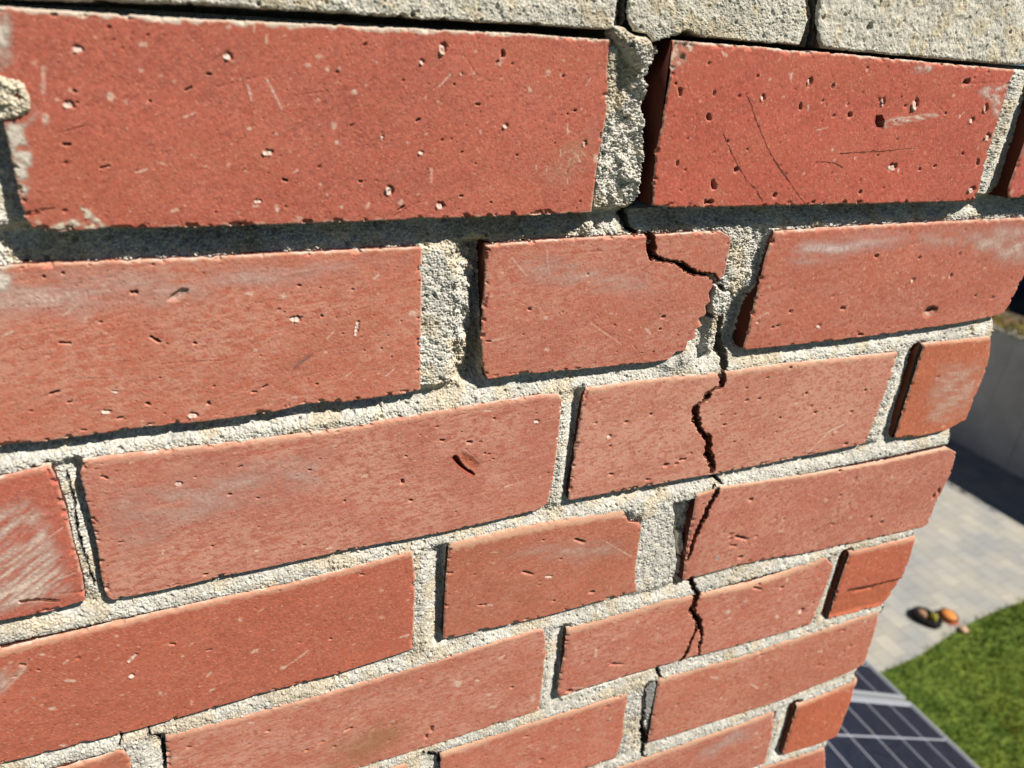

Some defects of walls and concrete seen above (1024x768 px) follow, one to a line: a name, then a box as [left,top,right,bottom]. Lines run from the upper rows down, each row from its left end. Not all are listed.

crack [613,0,625,27]
crack [616,201,732,757]